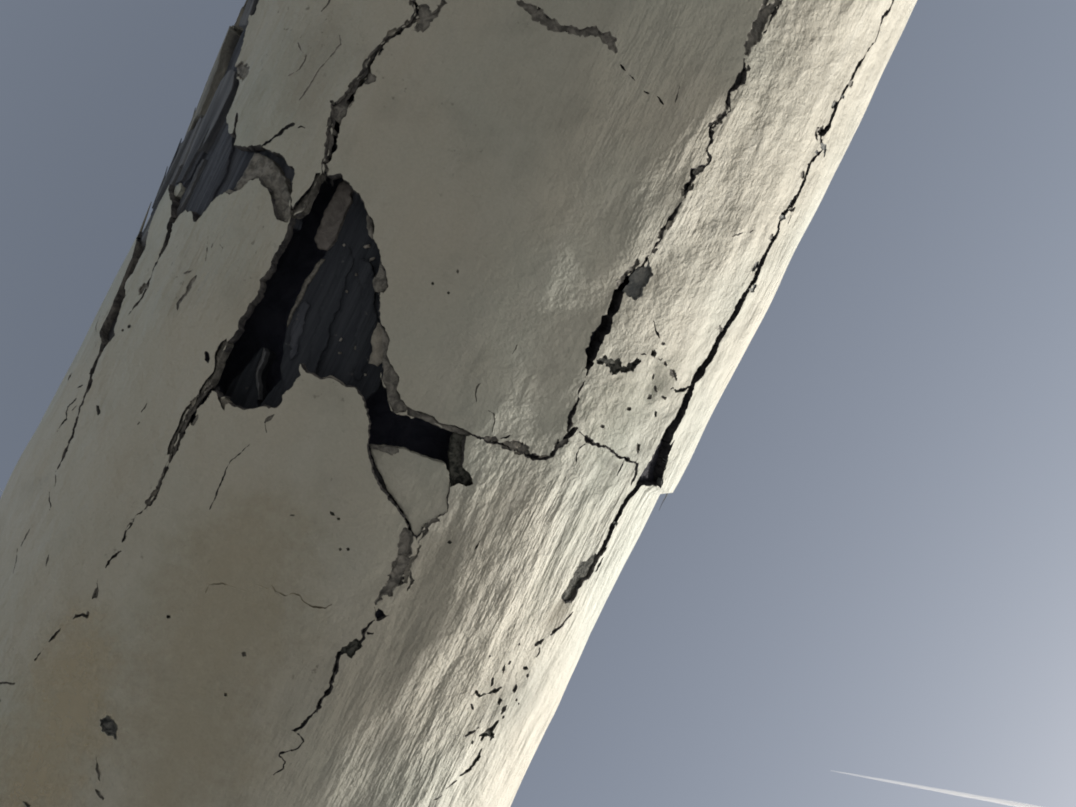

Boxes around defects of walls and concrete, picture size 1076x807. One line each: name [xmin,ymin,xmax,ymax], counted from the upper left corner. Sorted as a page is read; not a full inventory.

crack [262,0,447,186]
flaking render [516,0,635,80]
crack [49,217,176,508]
crack [176,236,223,310]
flaking render [138,0,473,540]
crack [470,0,894,548]
crack [34,379,220,661]
crack [209,414,275,510]
crack [205,582,332,609]
crack [273,448,440,775]
flaking render [100,715,118,740]